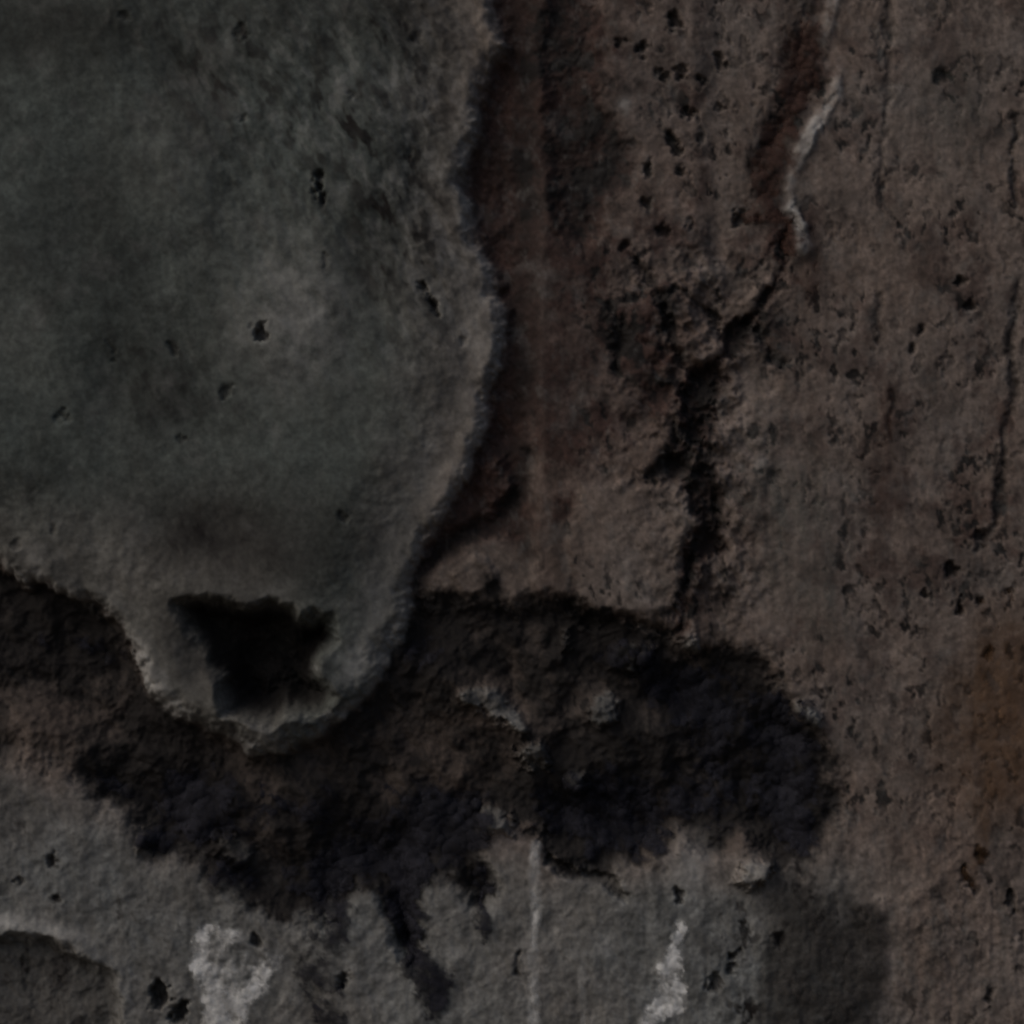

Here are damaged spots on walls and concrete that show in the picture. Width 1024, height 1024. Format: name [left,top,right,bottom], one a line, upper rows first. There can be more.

crack [605,302,629,379]
spalling [0,0,844,955]
crack [631,219,796,643]
damp [530,638,822,863]
damp [134,762,495,1024]
spalling [960,845,989,896]
spalling [1004,889,1018,914]
damp [642,921,688,1024]
spalling [704,947,743,995]
damp [757,900,886,1024]
spalling [984,986,996,1009]